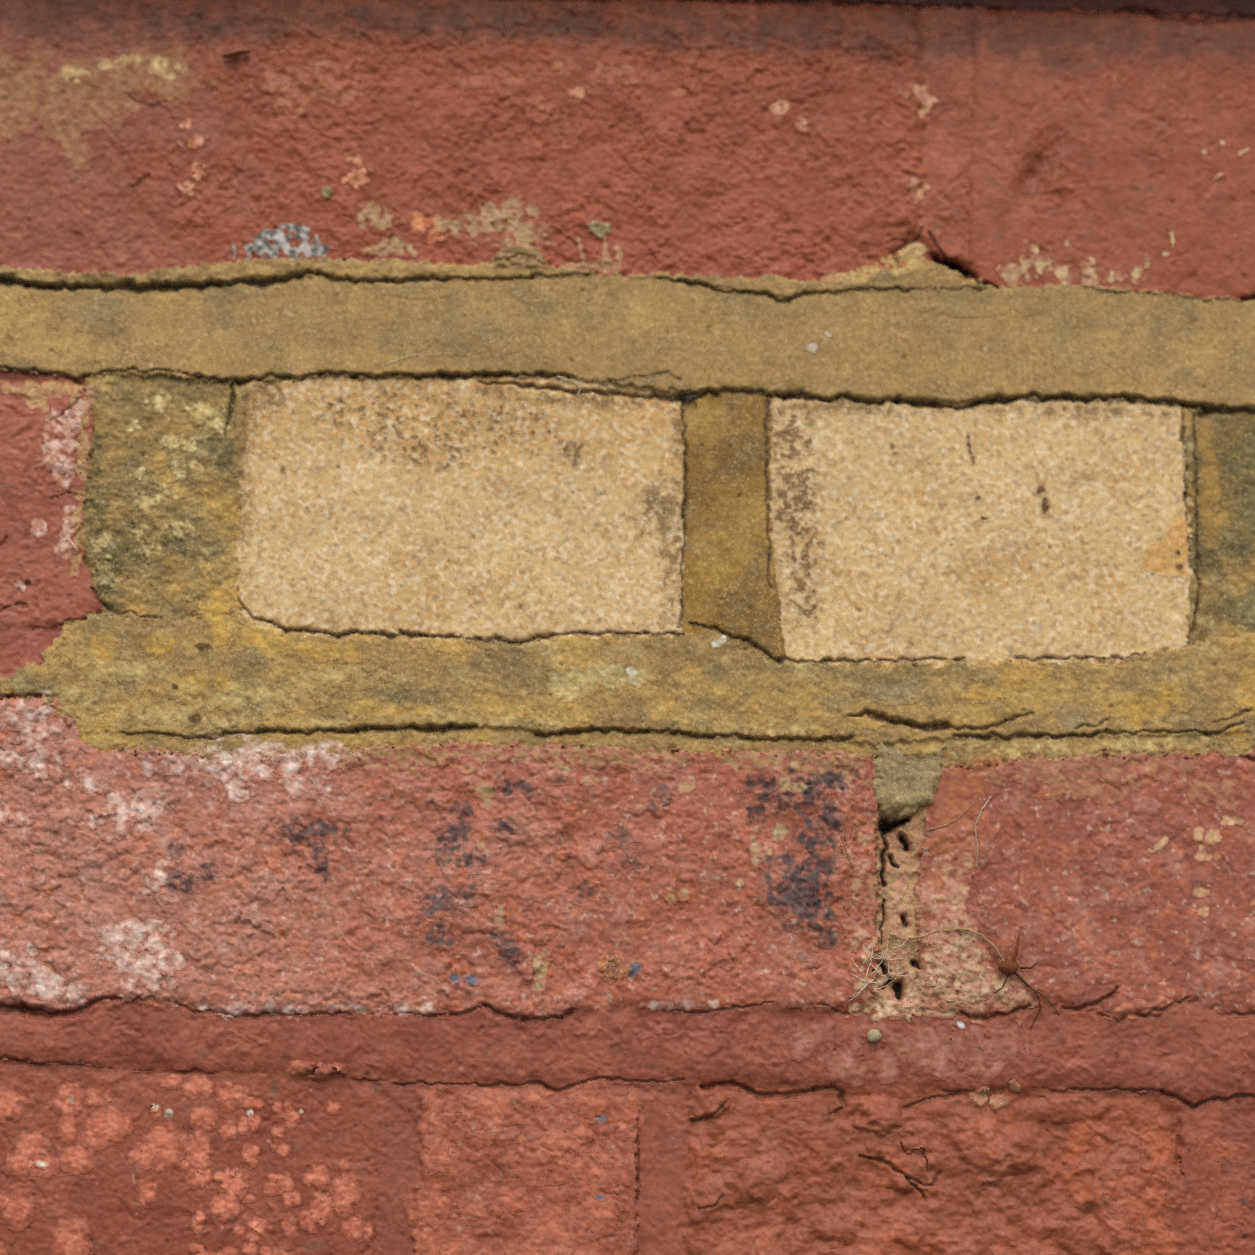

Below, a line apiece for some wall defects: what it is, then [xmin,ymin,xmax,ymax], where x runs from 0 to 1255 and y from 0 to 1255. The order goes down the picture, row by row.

peeling [225,221,339,262]
peeling [490,243,551,268]
peeling [28,384,97,561]
spalling [1141,512,1191,579]
peeling [12,580,27,593]
spalling [193,641,215,654]
spalling [184,710,205,726]
peeling [839,748,1045,1041]